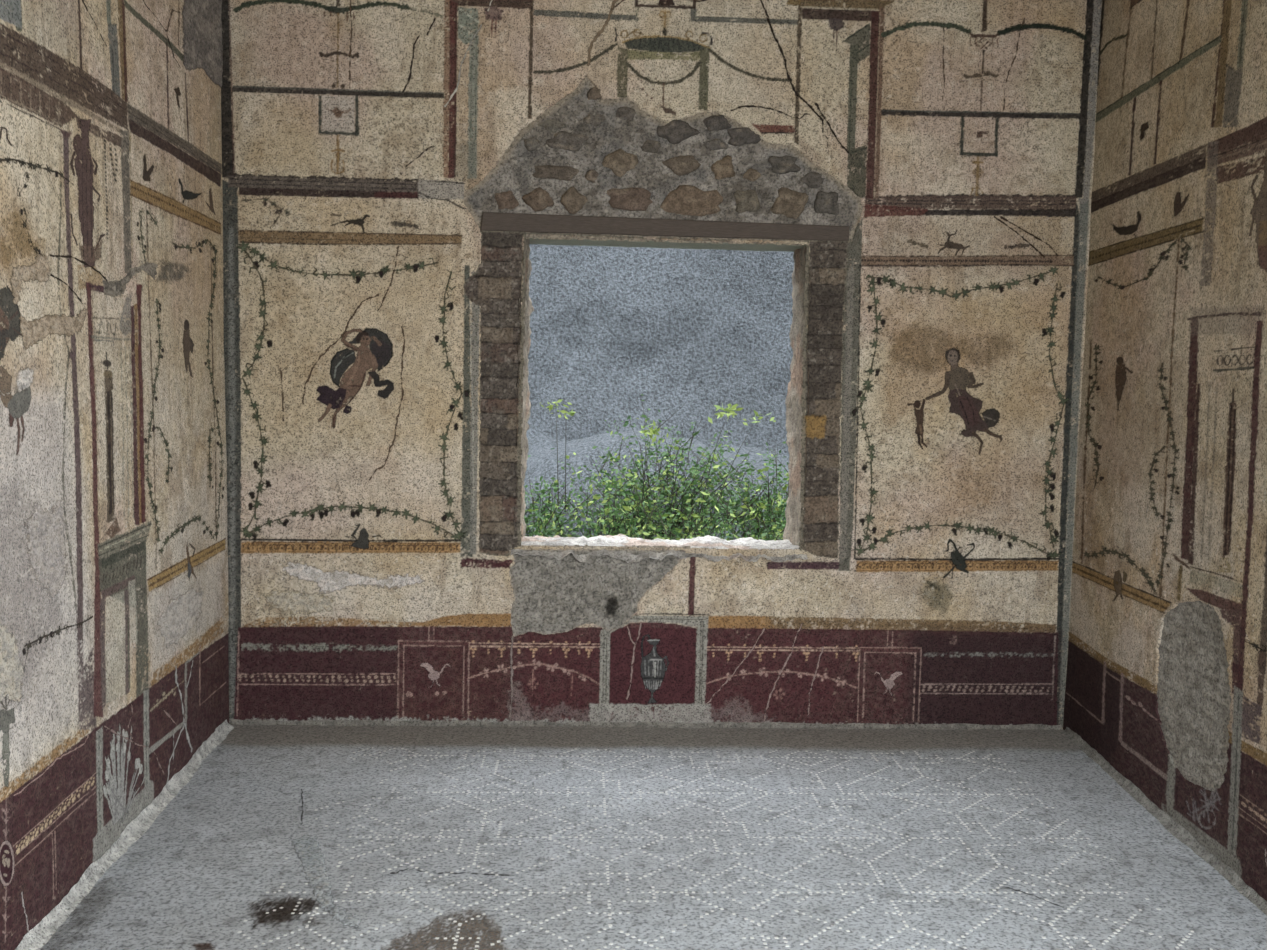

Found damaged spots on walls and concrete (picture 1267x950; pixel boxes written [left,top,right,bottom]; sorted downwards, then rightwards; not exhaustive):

flaking render [182,0,223,88]
crack [587,0,625,66]
crack [731,0,849,153]
flaking render [463,76,863,637]
flaking render [1157,601,1231,792]